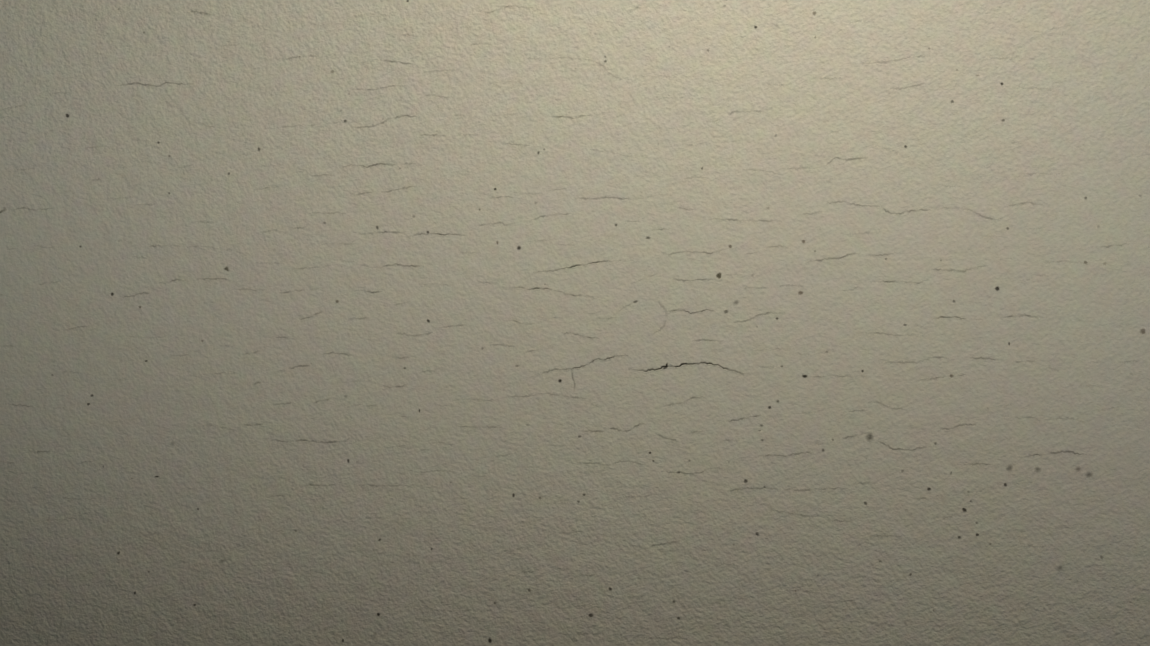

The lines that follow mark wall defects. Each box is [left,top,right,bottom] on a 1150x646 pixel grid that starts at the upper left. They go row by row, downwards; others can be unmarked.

crack [531,333,750,377]